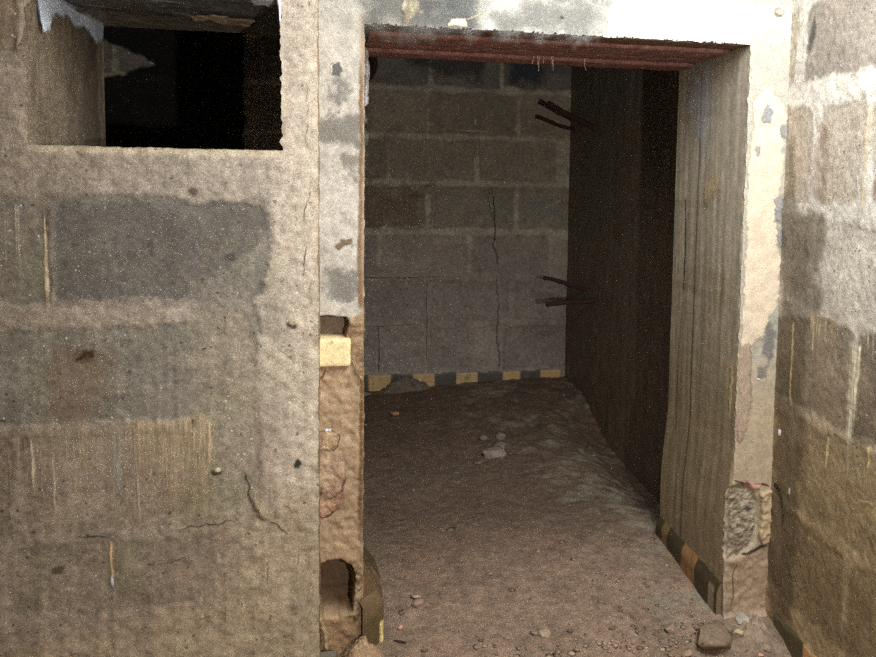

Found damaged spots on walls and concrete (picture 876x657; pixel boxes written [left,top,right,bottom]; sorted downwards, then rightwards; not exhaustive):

peeling [736,86,788,443]
crack [244,473,293,538]
spalling [727,486,756,557]
spalling [349,564,363,621]